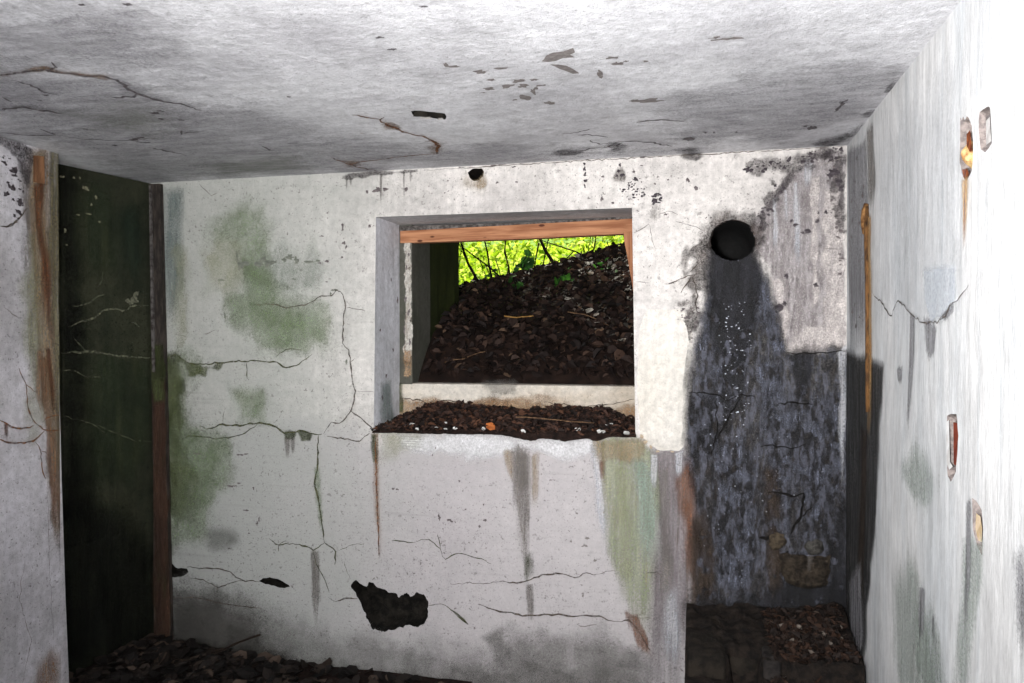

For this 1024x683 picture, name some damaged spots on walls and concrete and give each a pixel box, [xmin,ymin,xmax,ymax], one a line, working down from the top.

crack [0,62,199,154]
spalling [411,111,446,119]
peeling [0,137,33,219]
water stain [749,112,875,340]
corrosion [28,150,60,536]
crack [873,286,968,325]
water stain [472,391,554,409]
crack [175,290,652,650]
water stain [593,249,883,659]
water stain [506,446,536,614]
spalling [972,498,983,555]
spalling [351,580,428,632]